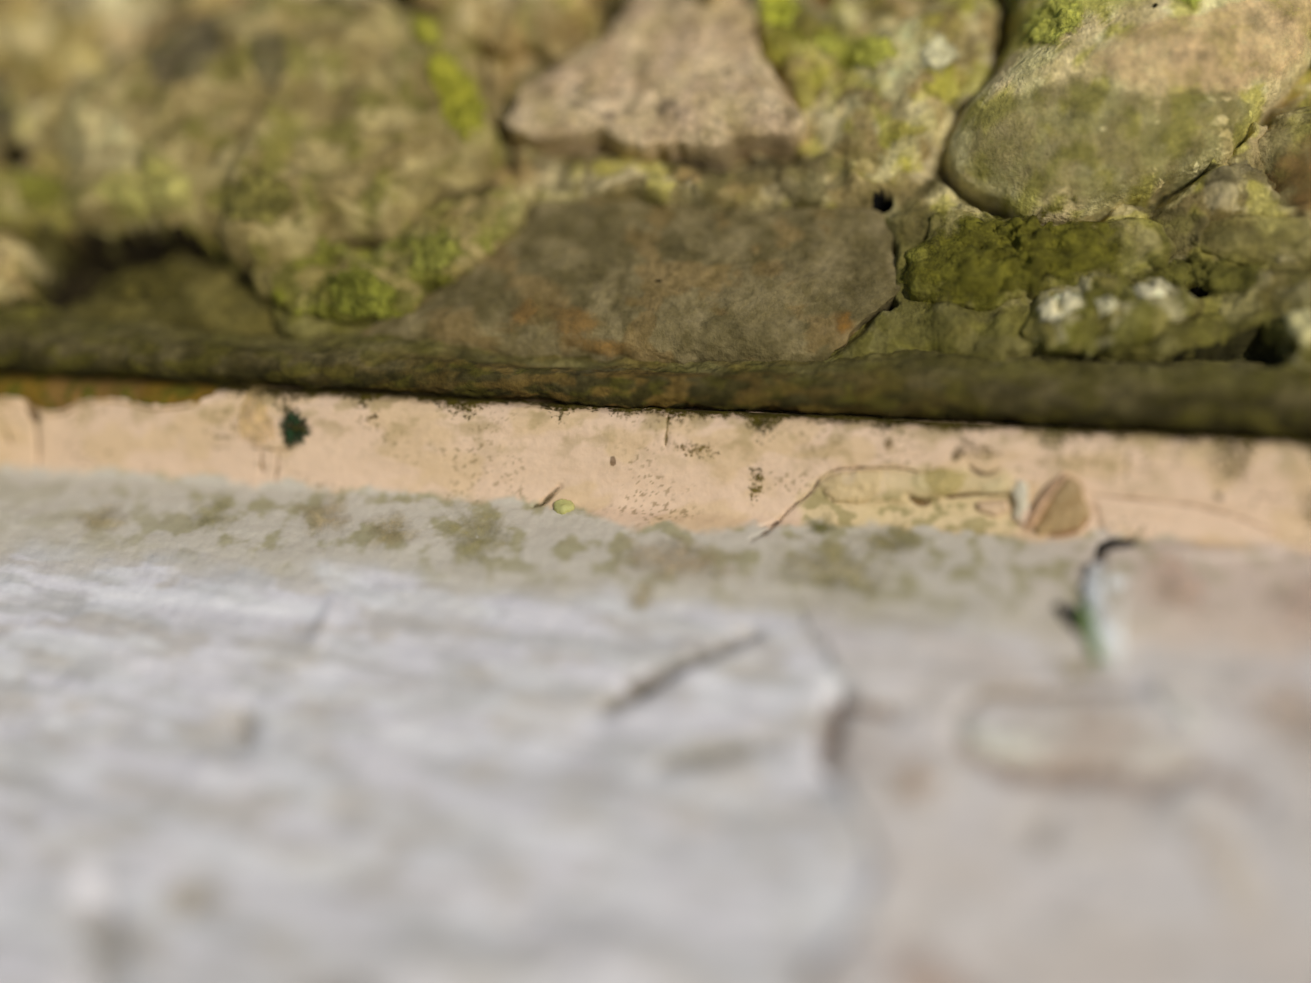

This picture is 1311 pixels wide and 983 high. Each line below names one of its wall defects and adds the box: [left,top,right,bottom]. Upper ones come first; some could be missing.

peeling [0,374,222,416]
peeling [1012,472,1091,537]